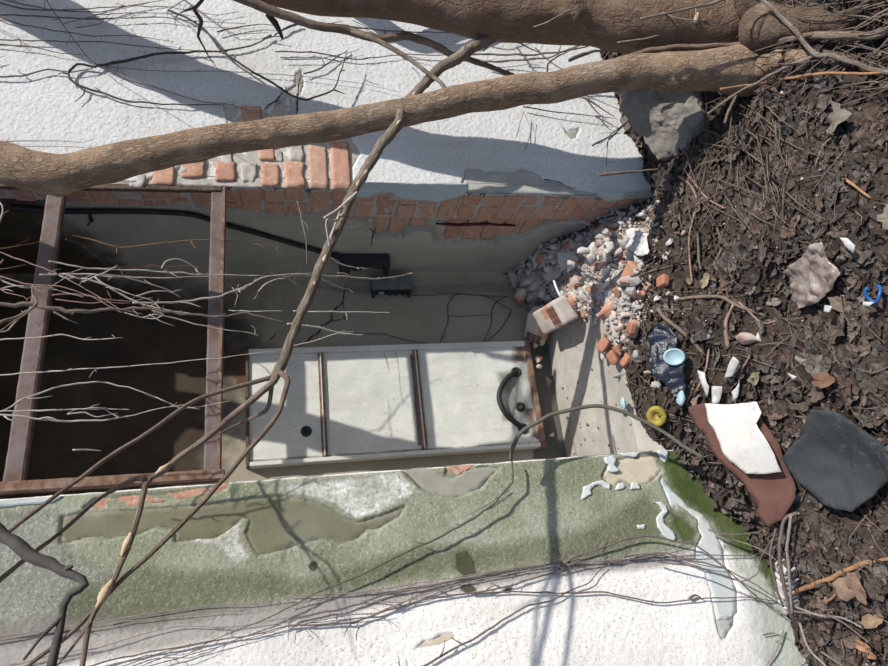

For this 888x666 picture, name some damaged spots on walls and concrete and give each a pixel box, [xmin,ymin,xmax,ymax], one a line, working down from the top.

spalling [225,71,303,123]
flaking render [0,189,47,201]
flaking render [66,138,653,240]
water stain [0,198,45,482]
water stain [27,231,209,480]
water stain [223,307,253,415]
crack [300,285,350,346]
peeling [61,483,404,555]
water stain [0,341,809,666]
peeling [402,464,498,498]
peeling [581,450,738,639]